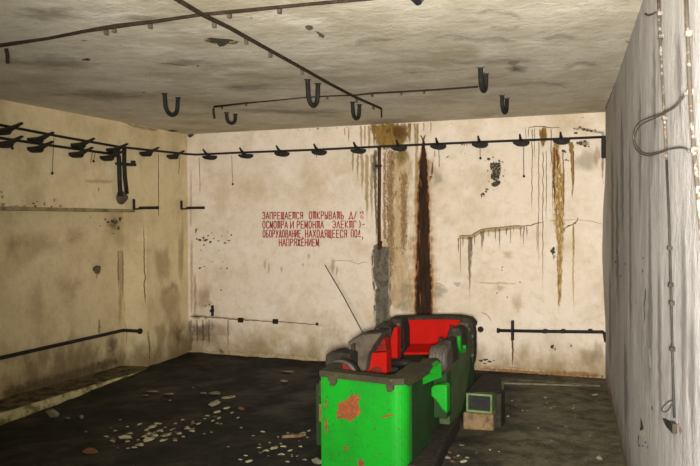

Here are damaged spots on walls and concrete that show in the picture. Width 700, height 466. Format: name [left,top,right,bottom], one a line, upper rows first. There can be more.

spalling [204,38,239,47]
water stain [371,123,411,308]
corrosion [415,135,434,315]
water stain [480,156,504,197]
corrosion [553,142,574,305]